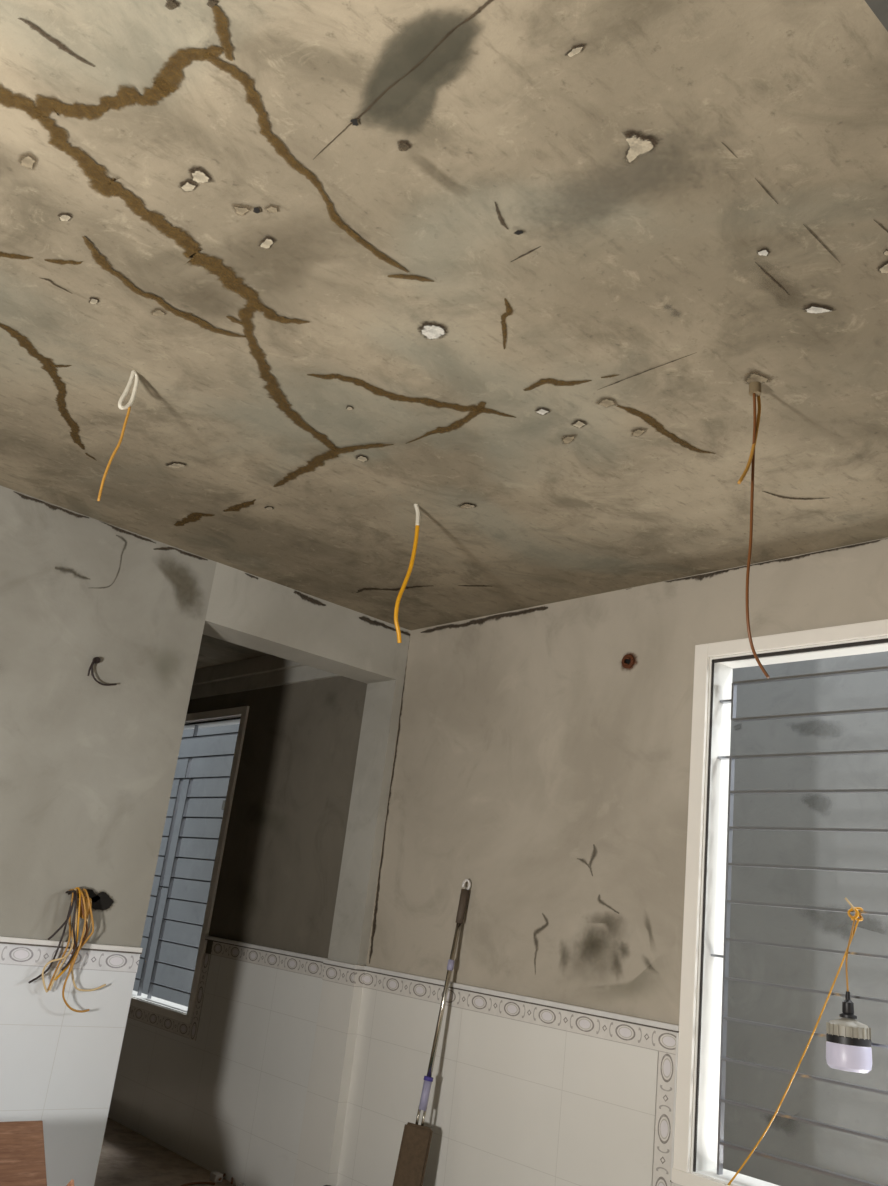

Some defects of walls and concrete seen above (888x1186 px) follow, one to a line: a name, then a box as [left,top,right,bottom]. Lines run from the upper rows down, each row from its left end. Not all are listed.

water stain [363,14,474,129]
spalling [624,131,657,163]
spalling [180,167,212,192]
crack [0,0,716,588]
spalling [804,304,833,313]
spalling [419,322,447,339]
crack [294,591,326,606]